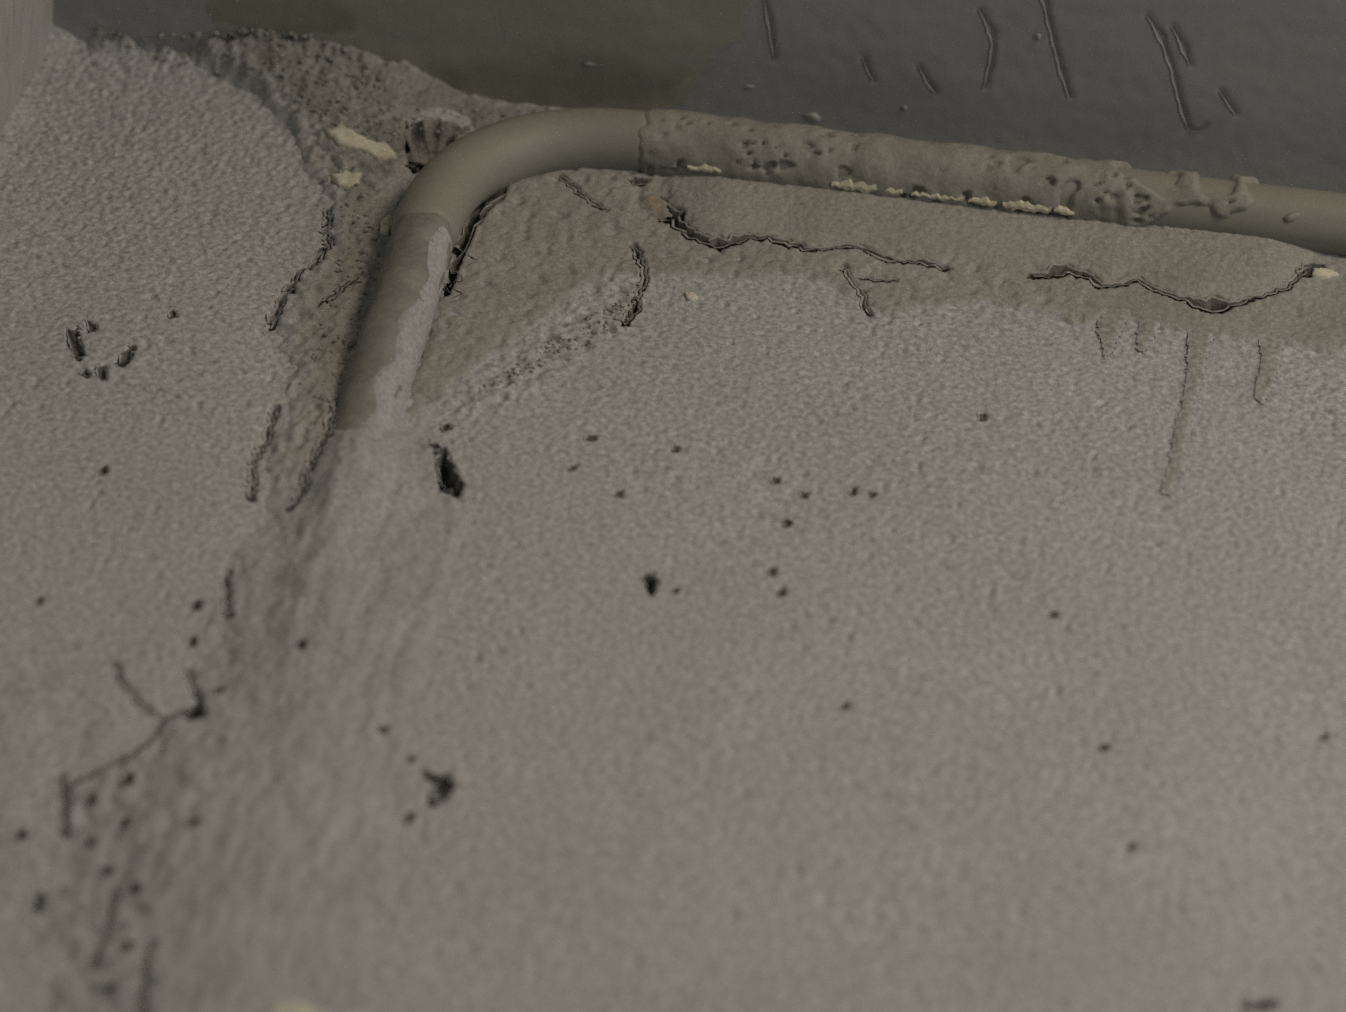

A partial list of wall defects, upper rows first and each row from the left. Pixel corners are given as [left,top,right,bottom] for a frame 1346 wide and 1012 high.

crack [622,244,648,327]
crack [660,198,949,315]
crack [1030,263,1308,314]